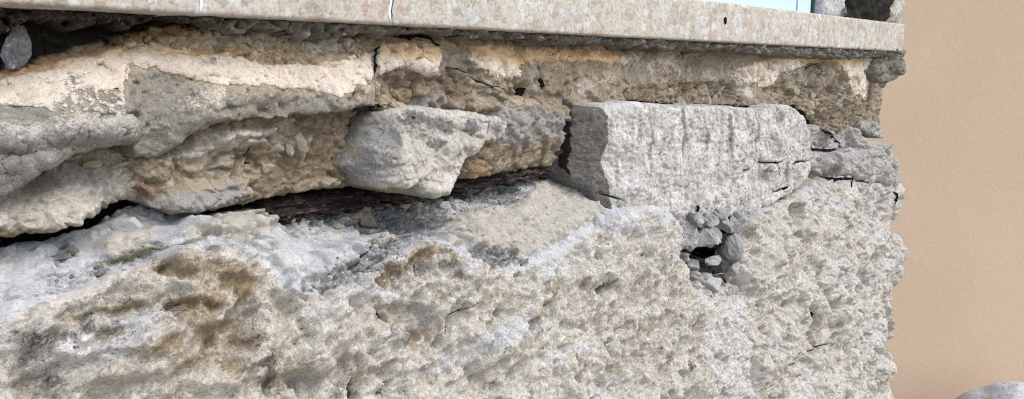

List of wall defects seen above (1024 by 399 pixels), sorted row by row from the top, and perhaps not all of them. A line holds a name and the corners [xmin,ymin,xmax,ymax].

crack [373,0,505,91]
crack [619,100,749,108]
crack [742,63,869,192]
spalling [679,204,731,298]
water stain [165,296,222,345]